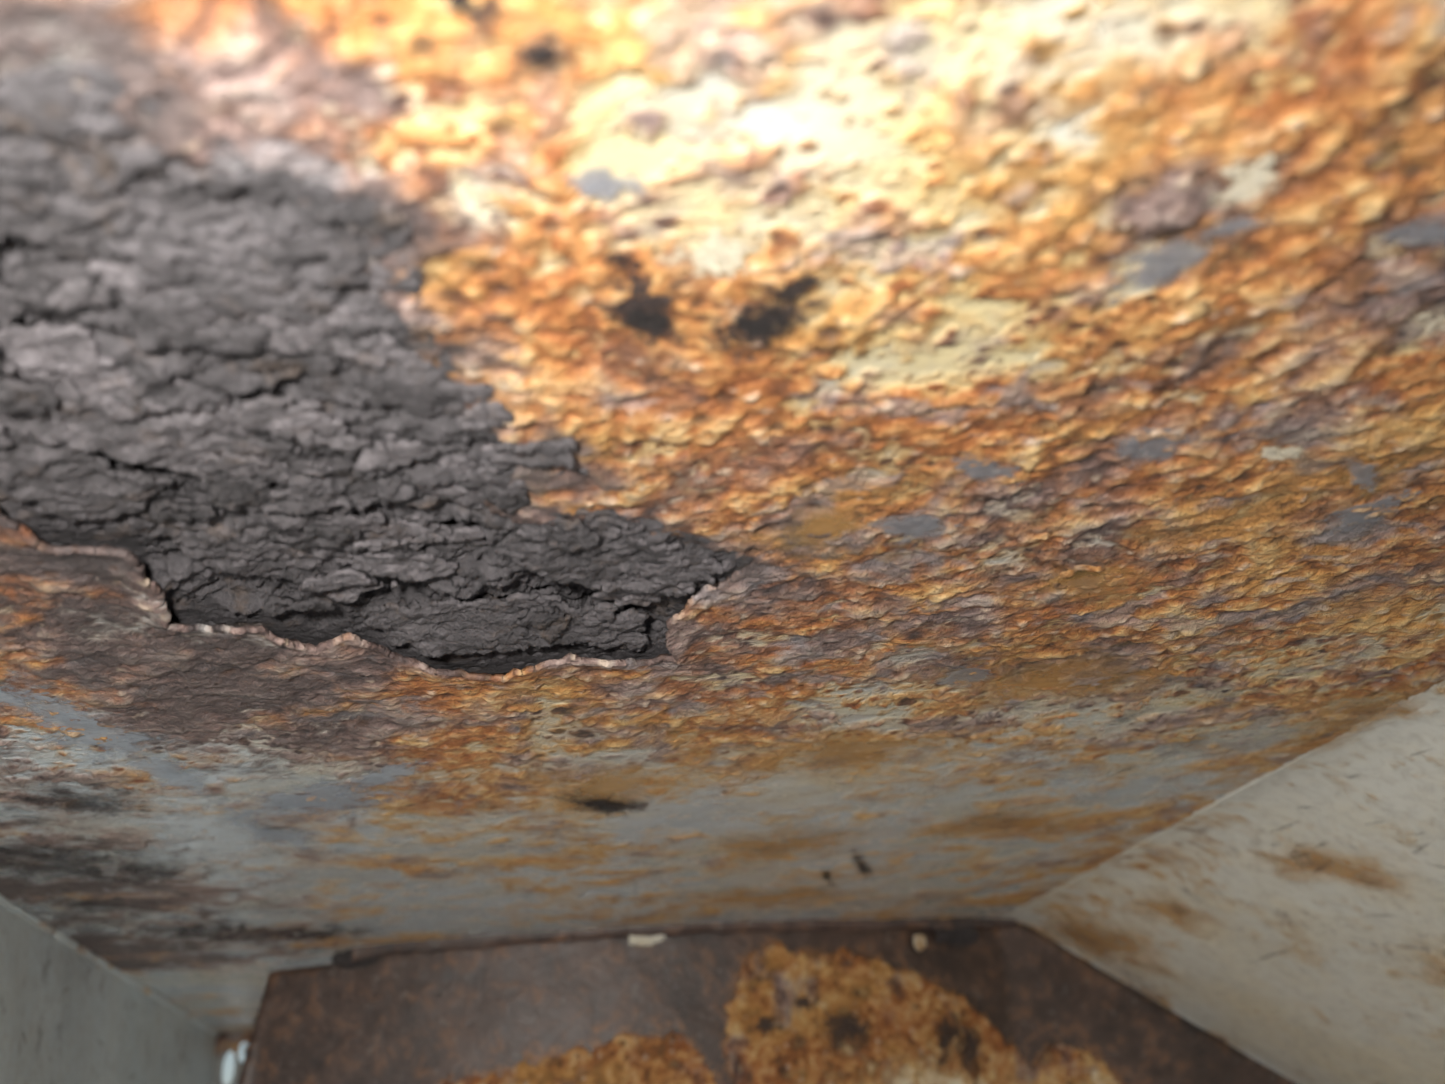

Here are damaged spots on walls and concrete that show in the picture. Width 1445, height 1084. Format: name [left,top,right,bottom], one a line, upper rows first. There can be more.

corrosion [446,0,501,35]
corrosion [510,30,568,74]
corrosion [594,246,831,353]
corrosion [1049,565,1123,589]
corrosion [0,783,149,813]
corrosion [0,841,184,912]
corrosion [755,1017,777,1036]
corrosion [794,993,875,1054]
corrosion [936,1010,981,1072]